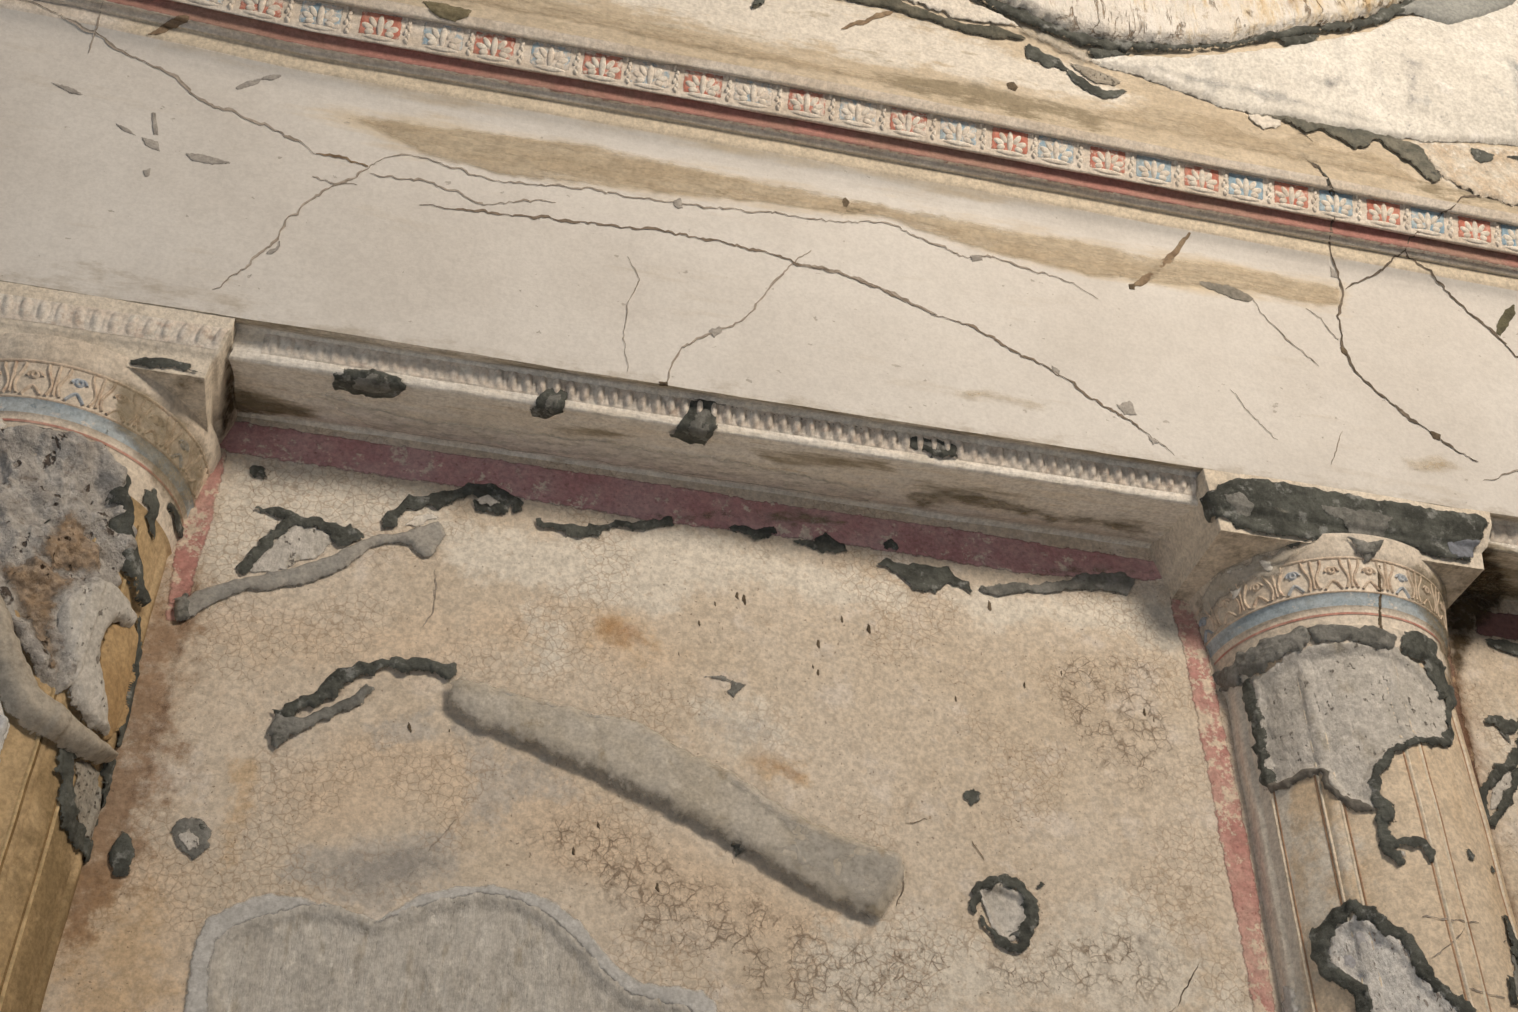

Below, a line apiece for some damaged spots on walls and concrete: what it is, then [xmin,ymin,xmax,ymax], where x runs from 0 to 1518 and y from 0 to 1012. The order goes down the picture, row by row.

flaking render [1025,44,1127,99]
flaking render [908,0,1403,46]
crack [26,0,1174,455]
flaking render [1417,143,1518,207]
crack [1253,132,1518,481]
spalling [0,418,137,695]
peeling [250,524,335,573]
flaking render [1212,624,1457,867]
flaking render [183,885,717,1012]
crack [559,830,938,1007]
flaking render [968,873,1045,953]
flaking render [1309,898,1477,1012]